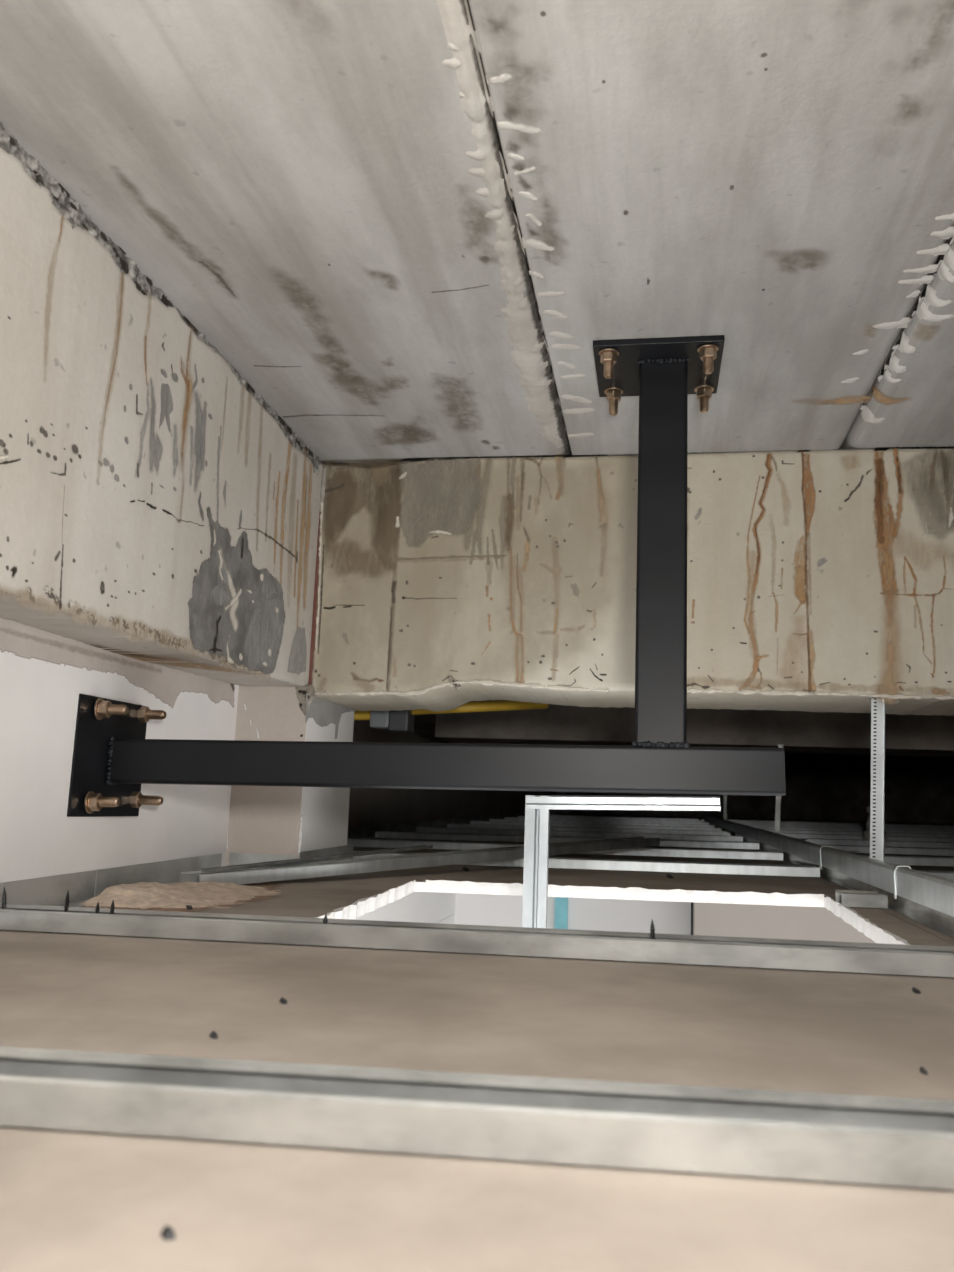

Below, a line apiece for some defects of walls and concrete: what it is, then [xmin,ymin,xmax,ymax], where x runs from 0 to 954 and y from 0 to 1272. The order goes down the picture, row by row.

water stain [509,144,531,188]
water stain [106,273,123,406]
spalling [0,122,324,476]
spalling [0,537,97,626]
flaking render [0,617,260,739]
peeling [100,360,355,738]
corrosion [273,442,327,685]
water stain [324,462,400,574]
water stain [465,440,531,578]
corrosion [506,457,542,683]
corrosion [739,453,773,690]
corrosion [874,448,947,700]